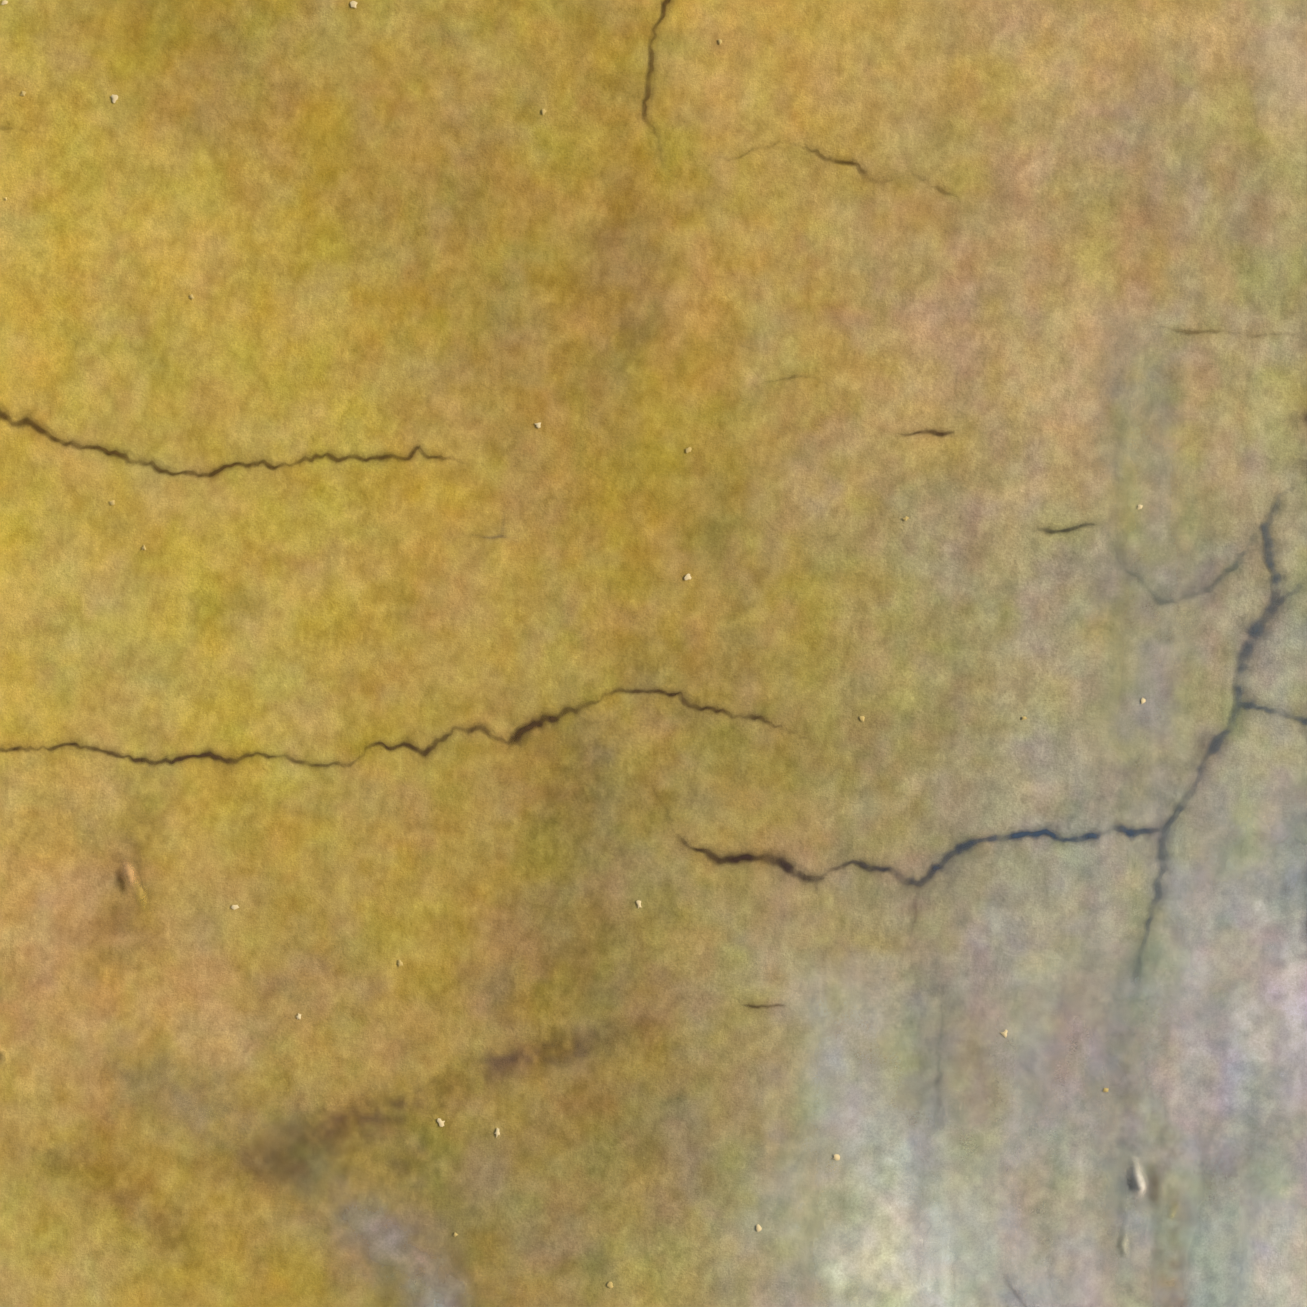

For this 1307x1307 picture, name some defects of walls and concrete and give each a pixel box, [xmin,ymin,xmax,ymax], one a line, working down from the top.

crack [644,0,671,118]
crack [0,410,442,477]
crack [914,429,951,437]
crack [1209,524,1307,754]
crack [10,742,328,766]
crack [374,707,577,756]
crack [630,689,767,722]
crack [695,848,812,881]
crack [846,805,1184,931]
water stain [1148,840,1307,1307]
water stain [818,999,1152,1307]
water stain [341,1205,476,1307]